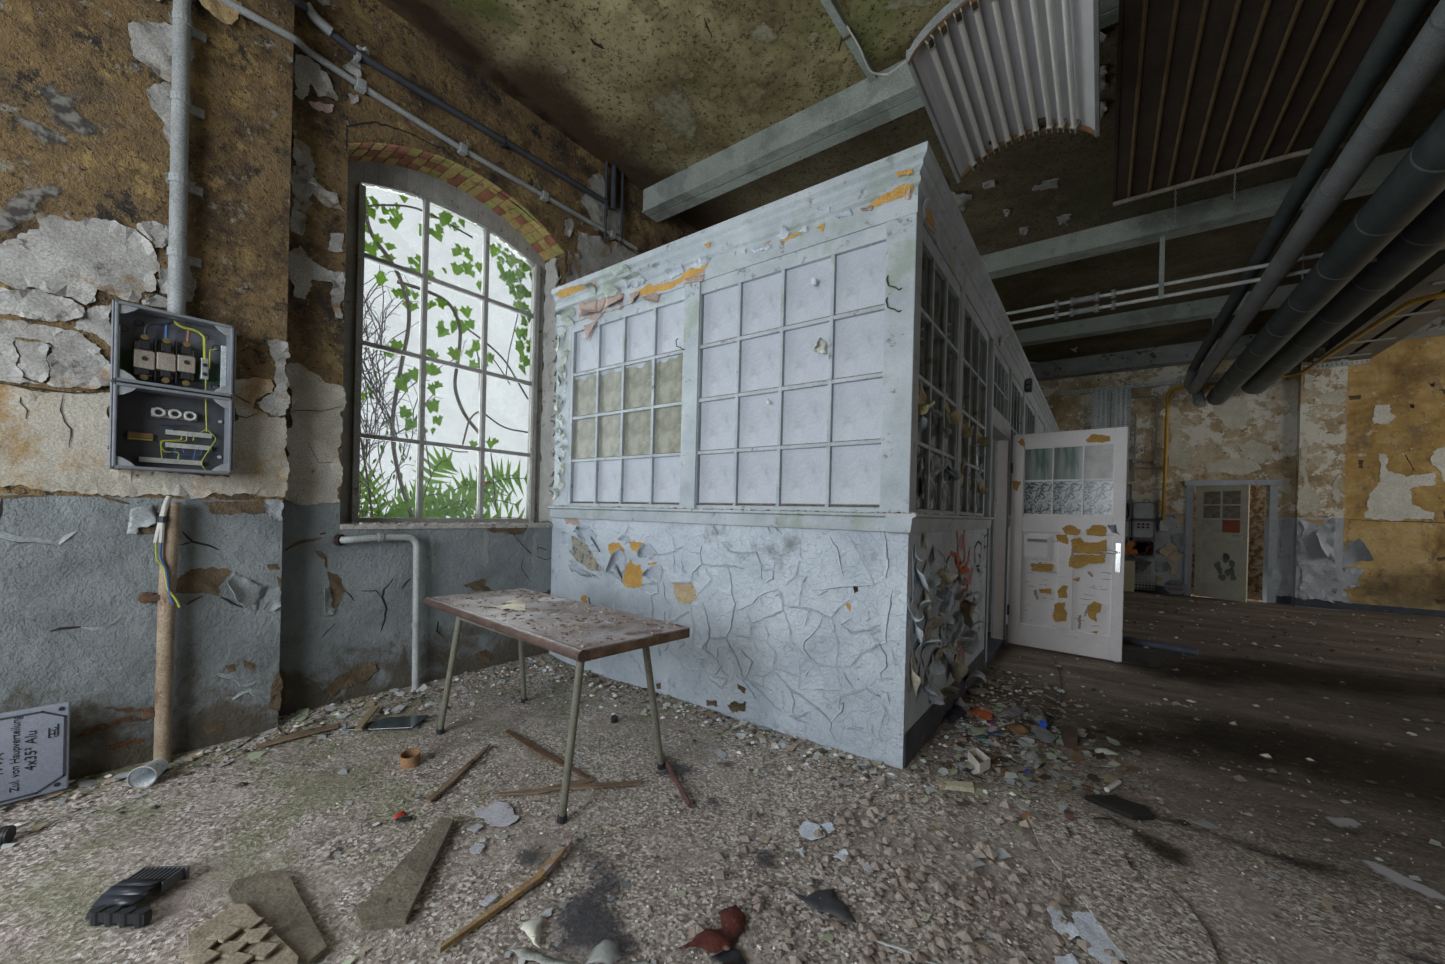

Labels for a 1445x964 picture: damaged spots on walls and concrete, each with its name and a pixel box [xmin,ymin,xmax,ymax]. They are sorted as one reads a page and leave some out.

peeling [128,0,172,150]
peeling [288,130,346,319]
peeling [0,184,347,534]
peeling [539,173,711,605]
crack [0,494,77,547]
crack [50,619,121,632]
crack [97,495,130,504]
crack [181,532,219,550]
crack [366,578,411,631]
crack [592,520,987,742]
peeling [1030,525,1120,622]
peeling [1358,447,1445,521]